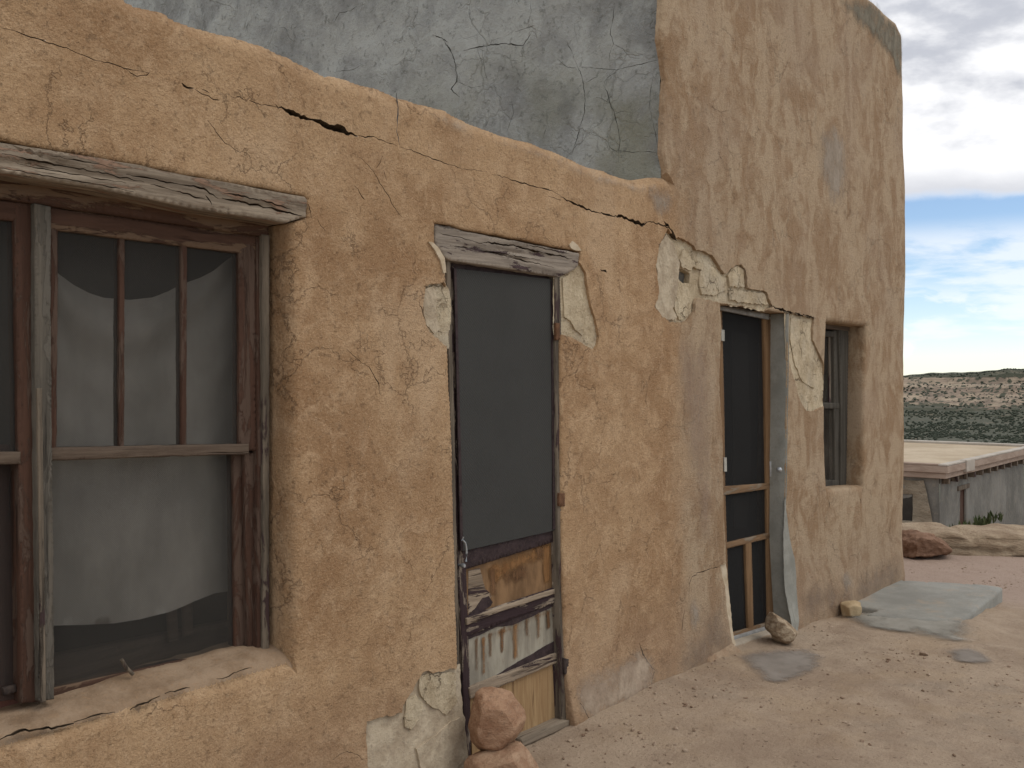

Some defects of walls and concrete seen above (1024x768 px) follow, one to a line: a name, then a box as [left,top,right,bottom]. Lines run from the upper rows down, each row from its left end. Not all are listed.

crack [3,28,150,77]
crack [559,10,658,162]
crack [182,83,677,241]
peeling [423,242,451,349]
peeling [553,264,596,349]
peeling [655,233,769,323]
peeling [784,311,824,411]
crack [0,687,189,740]
peeling [366,664,468,768]